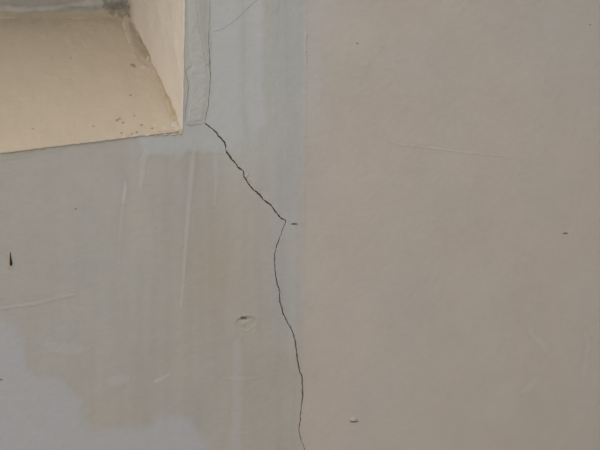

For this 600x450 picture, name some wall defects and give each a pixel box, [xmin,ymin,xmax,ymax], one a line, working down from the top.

crack [185,3,305,450]